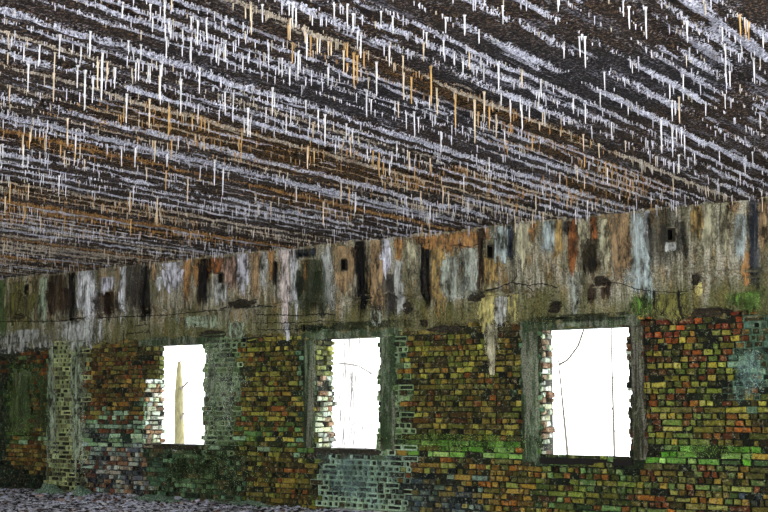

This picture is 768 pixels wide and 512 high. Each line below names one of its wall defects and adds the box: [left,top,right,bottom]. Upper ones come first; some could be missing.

corrosion [337,47,665,287]
corrosion [367,240,384,317]
water stain [354,219,611,375]
crack [485,269,558,292]
spalling [589,276,614,285]
water stain [625,211,687,317]
water stain [701,200,761,312]
water stain [0,262,184,486]